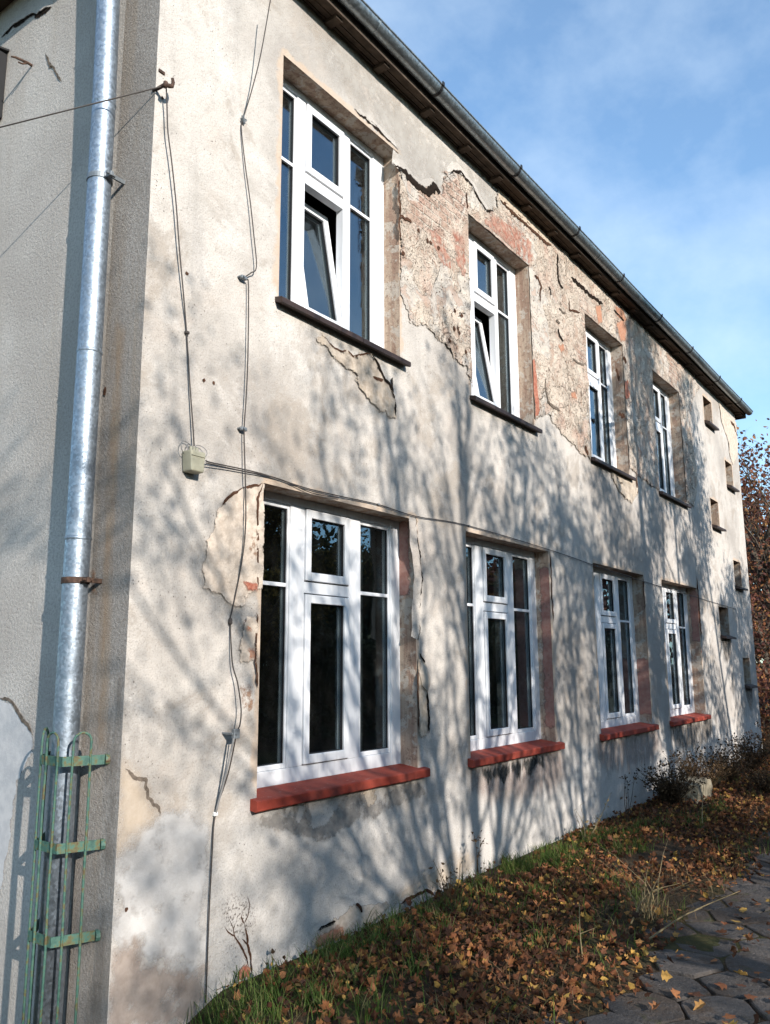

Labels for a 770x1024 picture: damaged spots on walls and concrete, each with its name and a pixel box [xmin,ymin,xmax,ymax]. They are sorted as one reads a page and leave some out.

crack [2,0,53,37]
crack [45,53,61,81]
spalling [317,327,403,420]
spalling [398,170,699,506]
spalling [202,473,265,688]